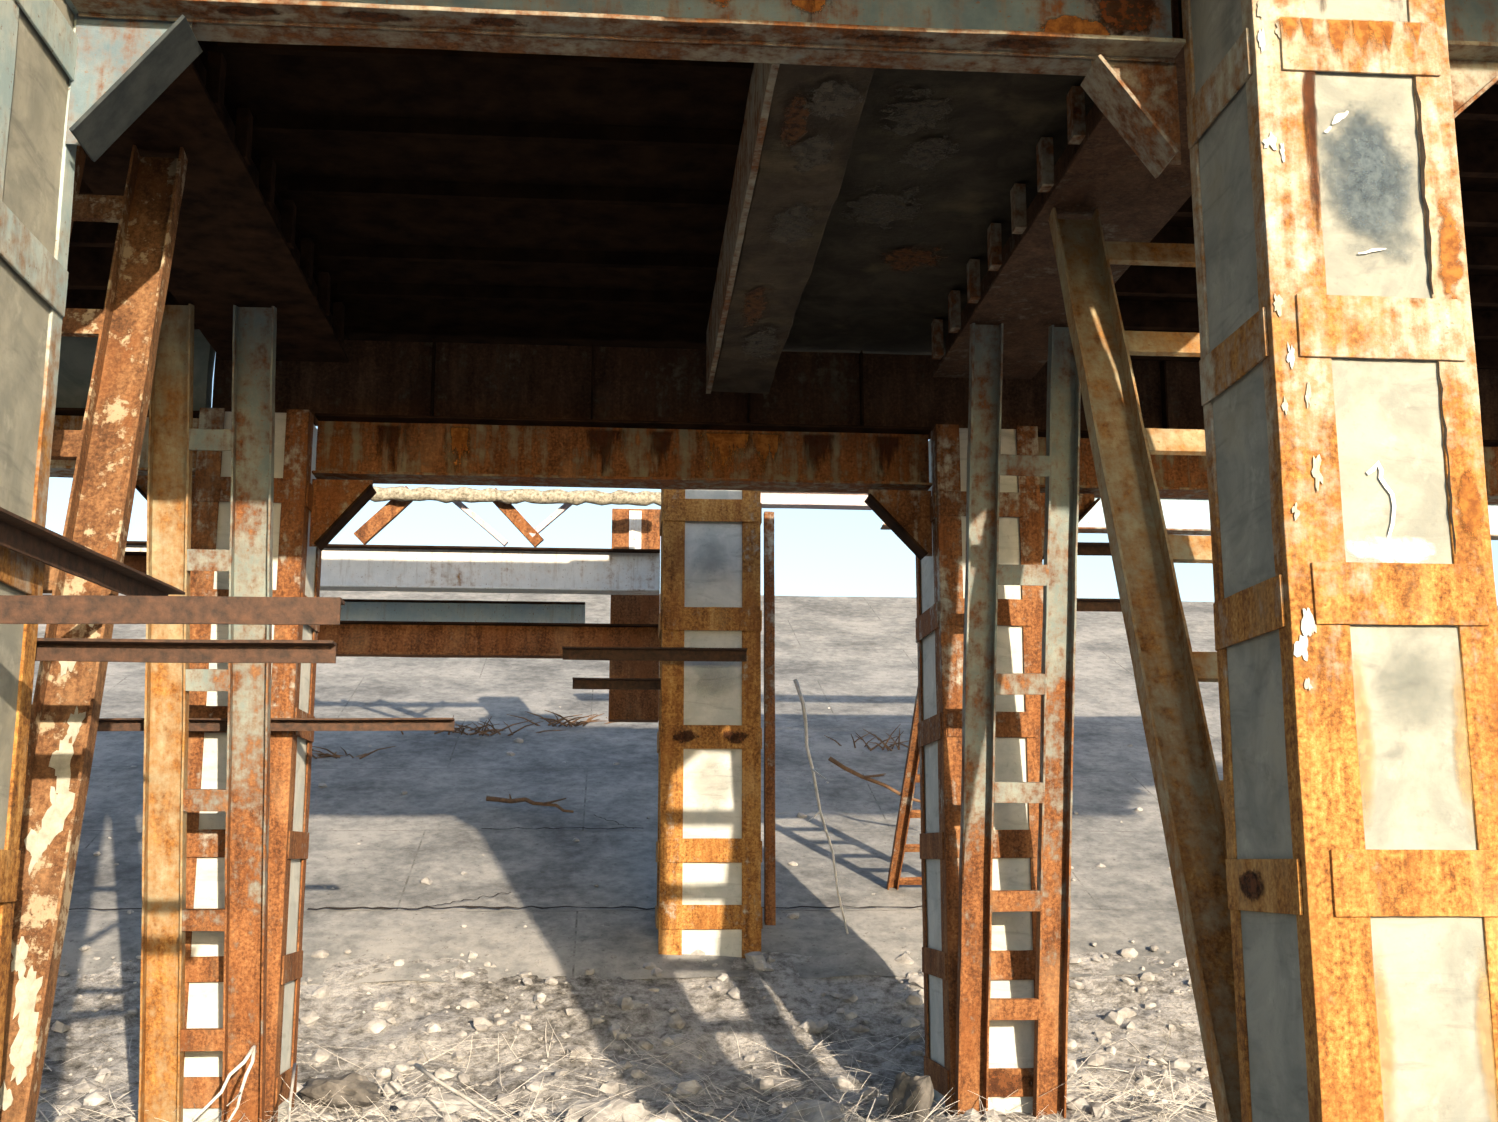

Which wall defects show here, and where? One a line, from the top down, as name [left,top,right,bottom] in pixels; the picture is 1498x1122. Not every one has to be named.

corrosion [218,6,280,16]
corrosion [341,12,411,23]
corrosion [471,18,525,27]
corrosion [988,0,1157,50]
leakage [1324,115,1412,243]
peeling [1273,294,1283,317]
peeling [1311,454,1323,492]
peeling [1293,608,1317,691]
peeling [59,661,76,677]
peeling [24,706,86,875]
corrosion [1239,871,1264,901]
peeling [0,936,43,1111]